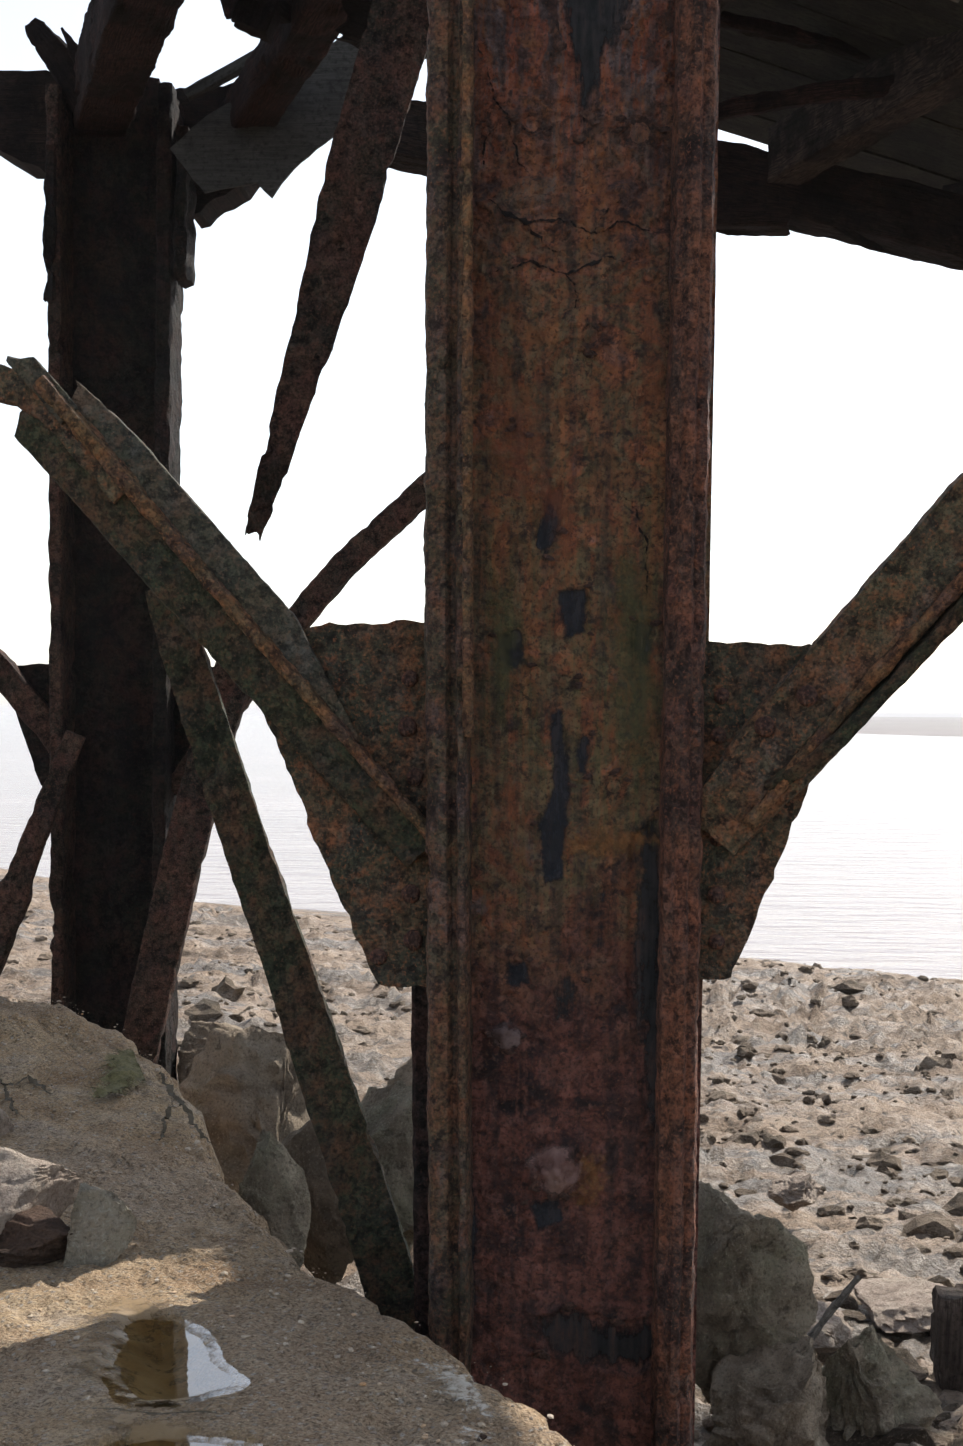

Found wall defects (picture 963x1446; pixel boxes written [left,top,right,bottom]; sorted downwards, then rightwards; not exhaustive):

peeling [552,0,633,145]
peeling [536,482,569,561]
peeling [558,584,594,638]
peeling [530,709,595,885]